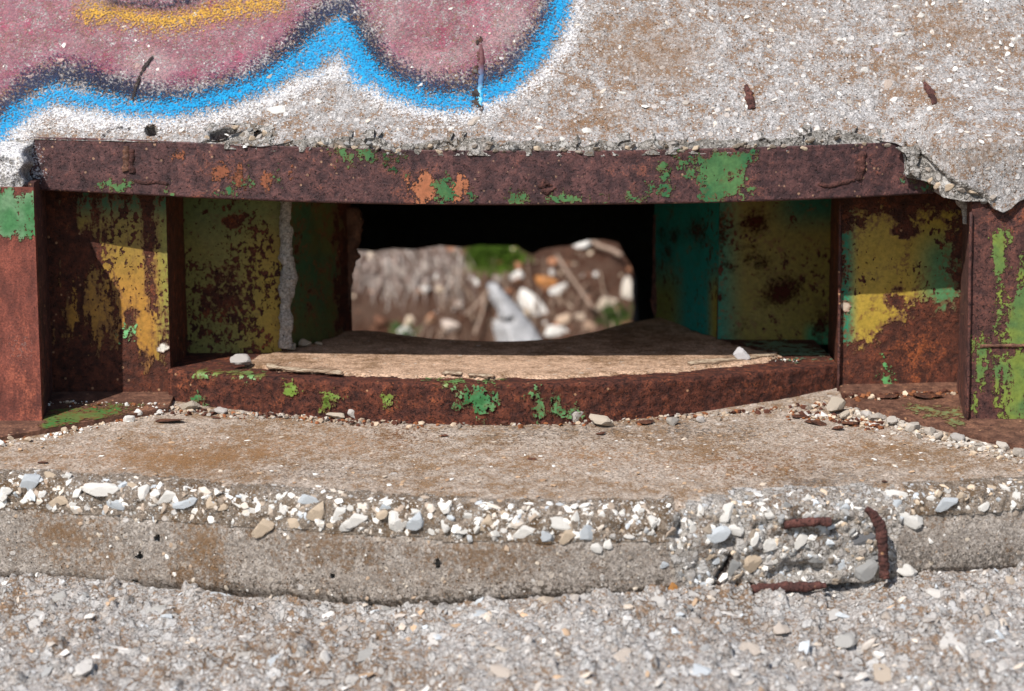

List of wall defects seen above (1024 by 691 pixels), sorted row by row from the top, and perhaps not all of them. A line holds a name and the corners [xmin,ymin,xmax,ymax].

peeling [762,1,843,72]
peeling [896,0,1021,88]
peeling [51,25,997,384]
peeling [899,226,1024,429]
spalling [0,377,1024,594]